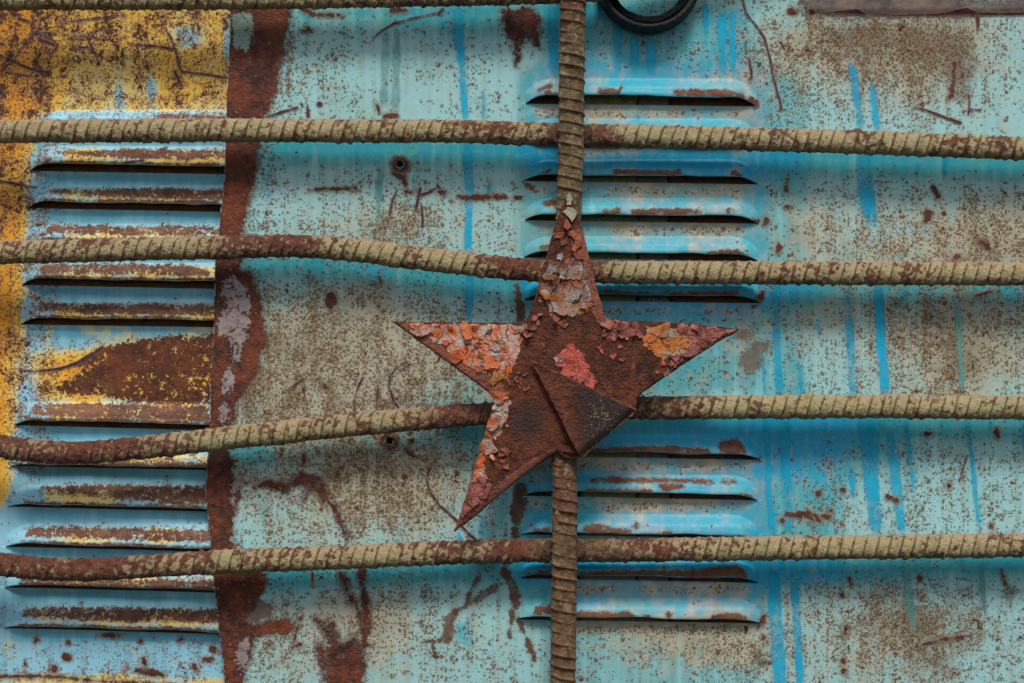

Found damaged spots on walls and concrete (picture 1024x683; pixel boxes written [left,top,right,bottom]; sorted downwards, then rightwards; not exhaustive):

rust [153,8,341,119]
rust [501,5,543,67]
rust [787,0,1024,31]
rust [41,142,261,239]
rust [602,207,702,215]
rust [19,258,269,429]
peeling [409,193,598,525]
peeling [597,317,736,377]
rust [24,450,247,550]
rust [586,476,752,496]
rust [0,568,372,683]
rust [422,565,551,662]